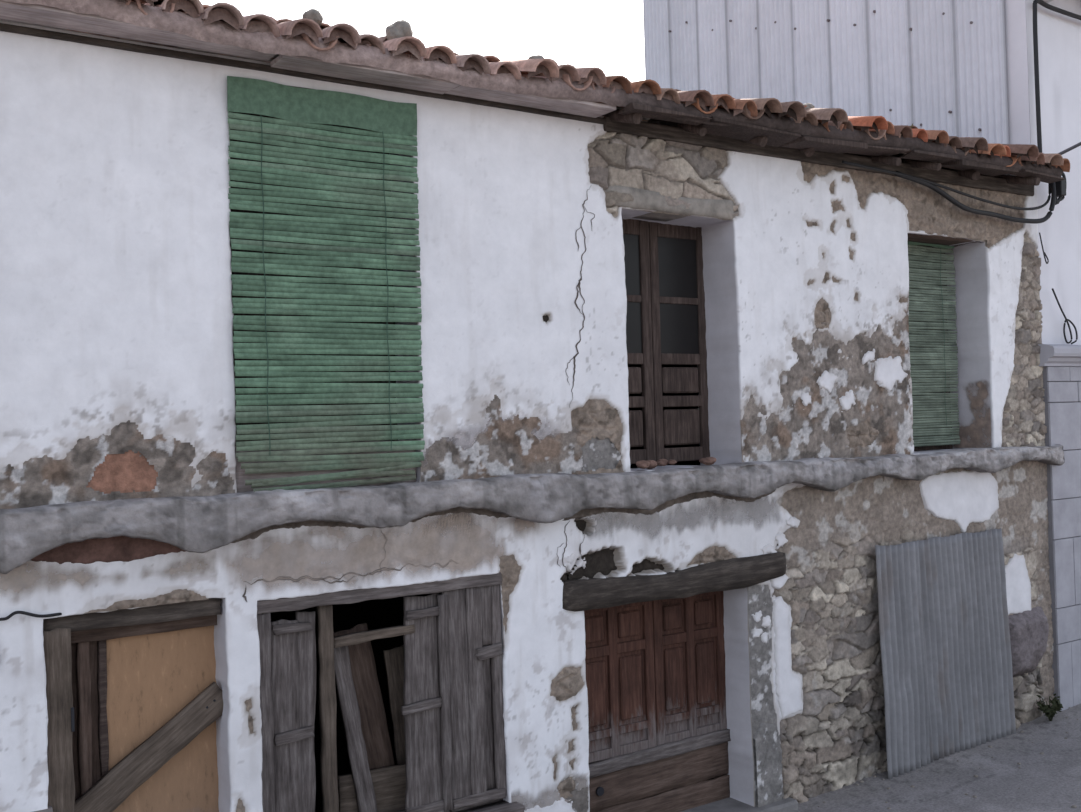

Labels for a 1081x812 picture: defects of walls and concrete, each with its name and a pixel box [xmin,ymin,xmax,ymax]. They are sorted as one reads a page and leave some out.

spalling [587,132,739,220]
crack [566,186,595,407]
spalling [801,162,1047,447]
peeling [0,420,237,509]
peeling [421,395,624,482]
peeling [740,297,913,463]
crack [242,533,458,602]
spalling [560,461,1055,807]
spalling [245,699,254,734]
spalling [550,667,588,812]